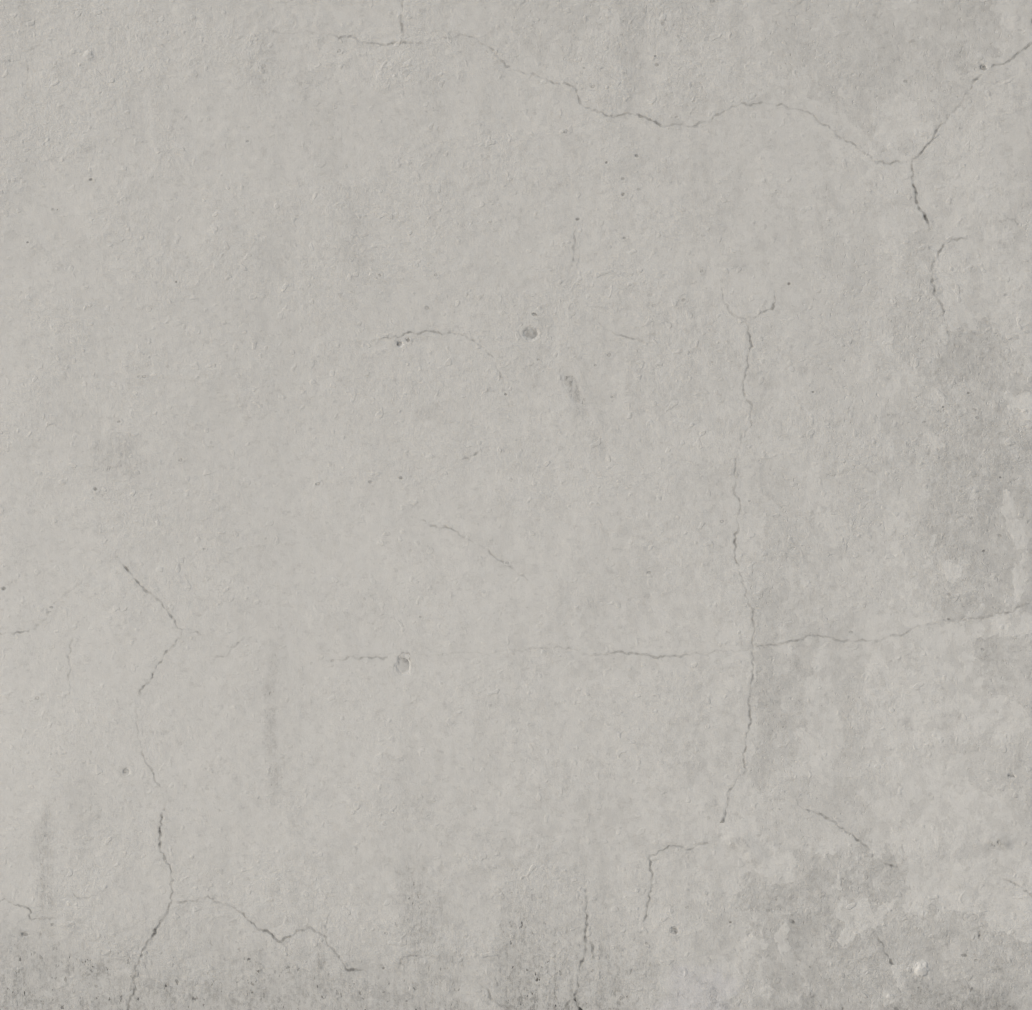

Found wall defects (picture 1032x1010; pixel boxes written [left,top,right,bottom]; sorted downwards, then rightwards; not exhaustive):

crack [907,8,1032,347]
crack [0,894,64,925]
crack [112,556,379,1010]
crack [320,651,405,667]
crack [638,277,782,933]
crack [791,792,906,872]